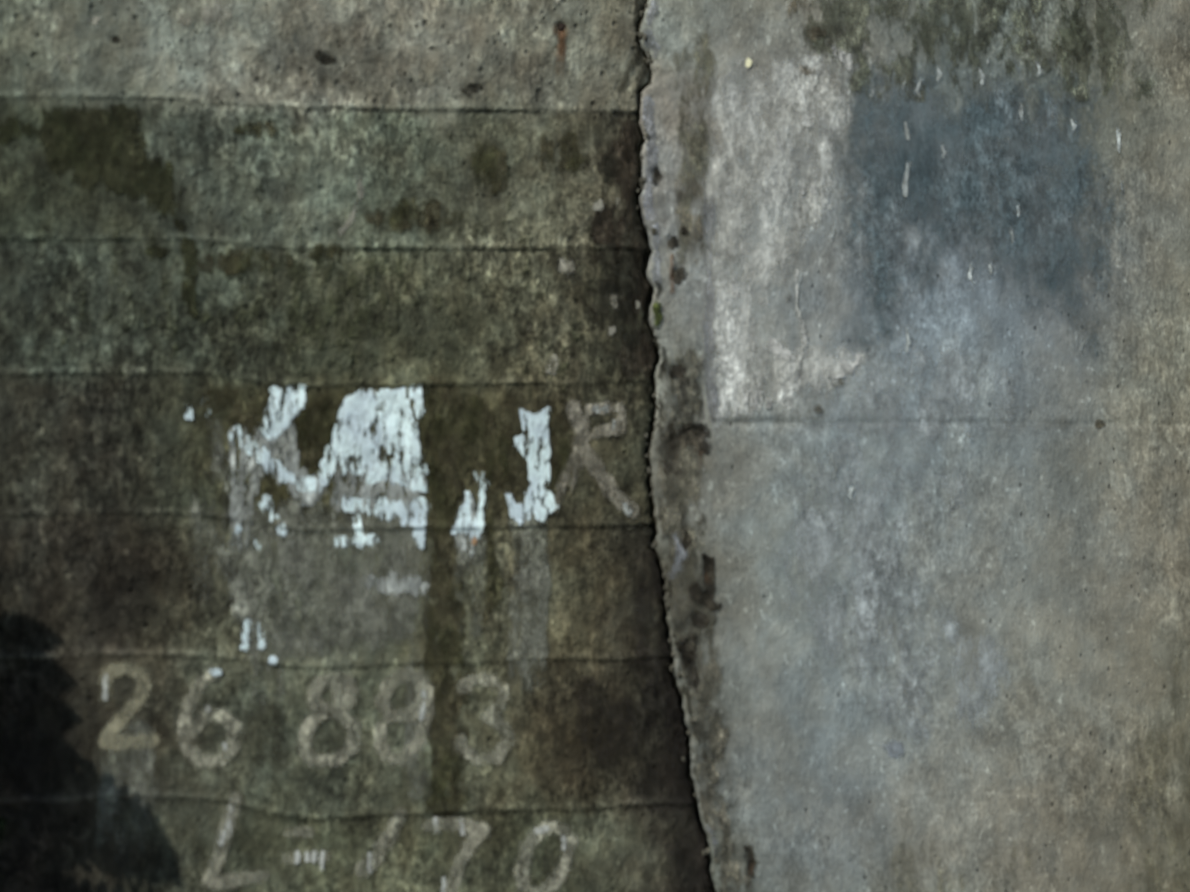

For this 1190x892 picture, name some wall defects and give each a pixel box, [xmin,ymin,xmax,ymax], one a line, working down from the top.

damp [788,0,1152,333]
peeling [228,422,427,549]
peeling [455,496,476,557]